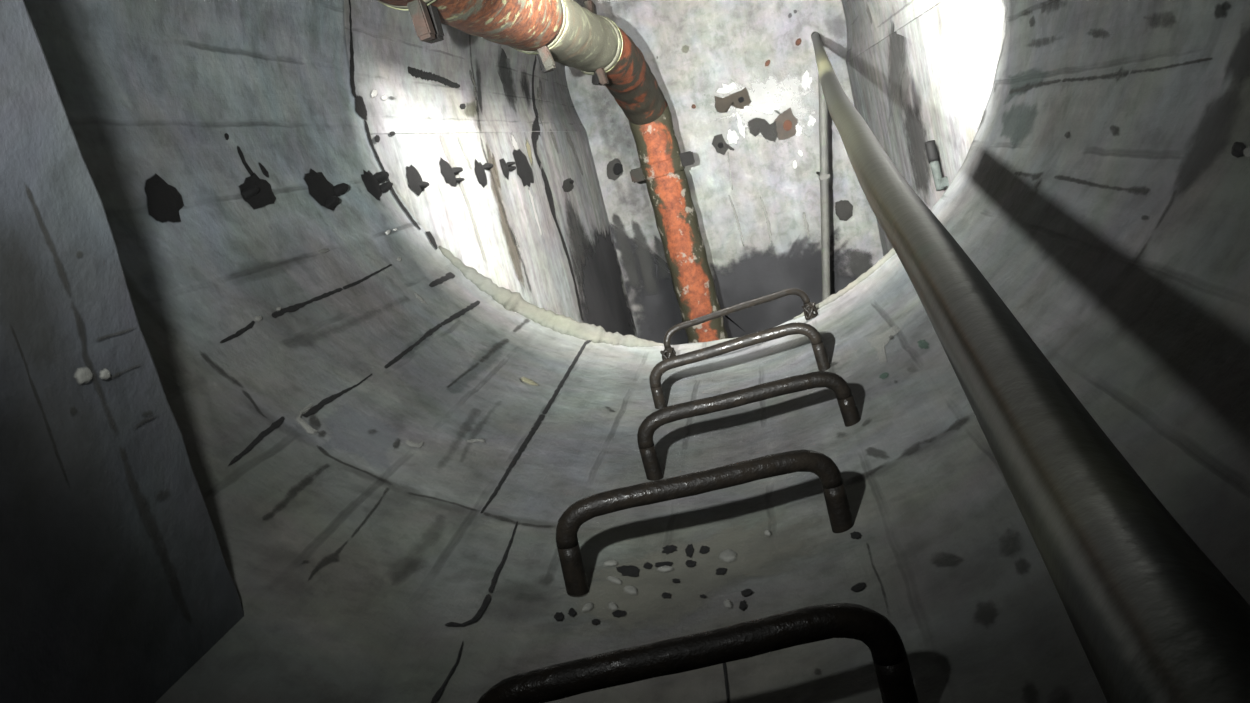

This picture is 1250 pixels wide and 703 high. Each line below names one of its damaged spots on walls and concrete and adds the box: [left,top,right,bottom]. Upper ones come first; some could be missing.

damp [1215,2,1230,18]
damp [1227,28,1250,79]
crack [220,264,392,343]
crack [429,272,455,287]
crack [448,35,531,387]
crack [481,55,592,513]
damp [566,199,688,345]
peeling [712,87,803,169]
damp [710,70,873,338]
damp [1175,95,1236,189]
crack [228,301,480,466]
crack [431,521,518,703]